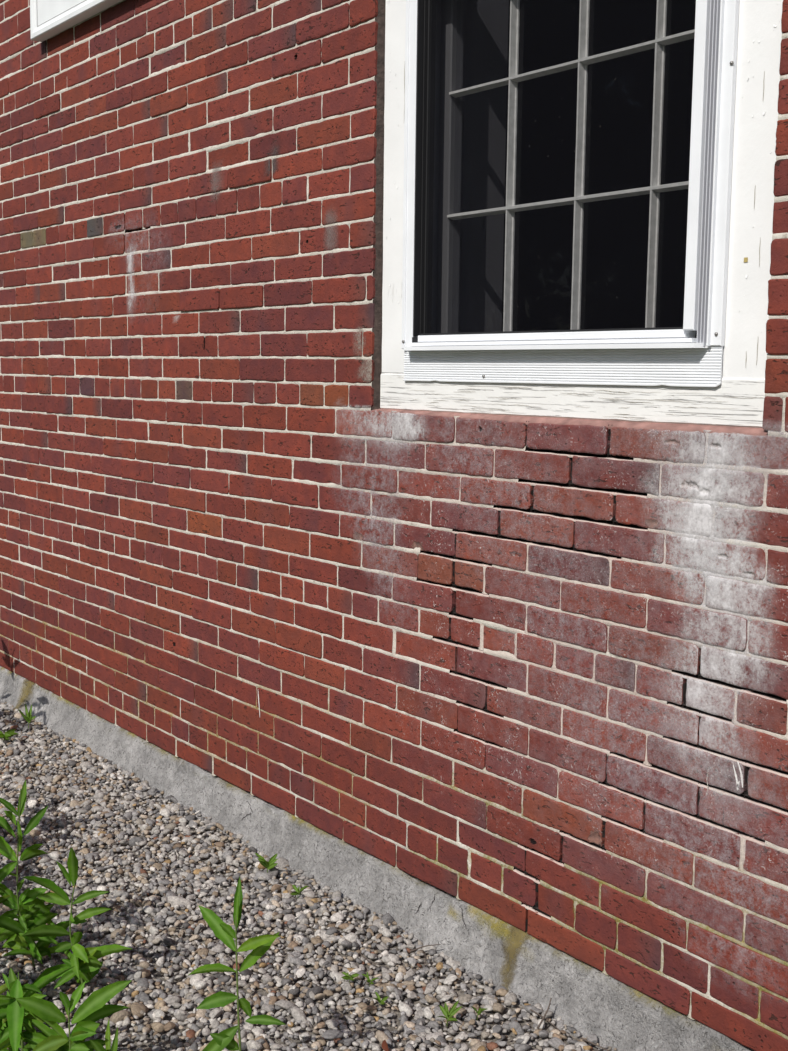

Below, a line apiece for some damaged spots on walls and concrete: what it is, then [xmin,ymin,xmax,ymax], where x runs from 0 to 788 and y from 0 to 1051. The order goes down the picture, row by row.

water stain [365,412,421,442]
water stain [660,430,767,790]
crack [514,648,788,932]
water stain [502,926,529,987]